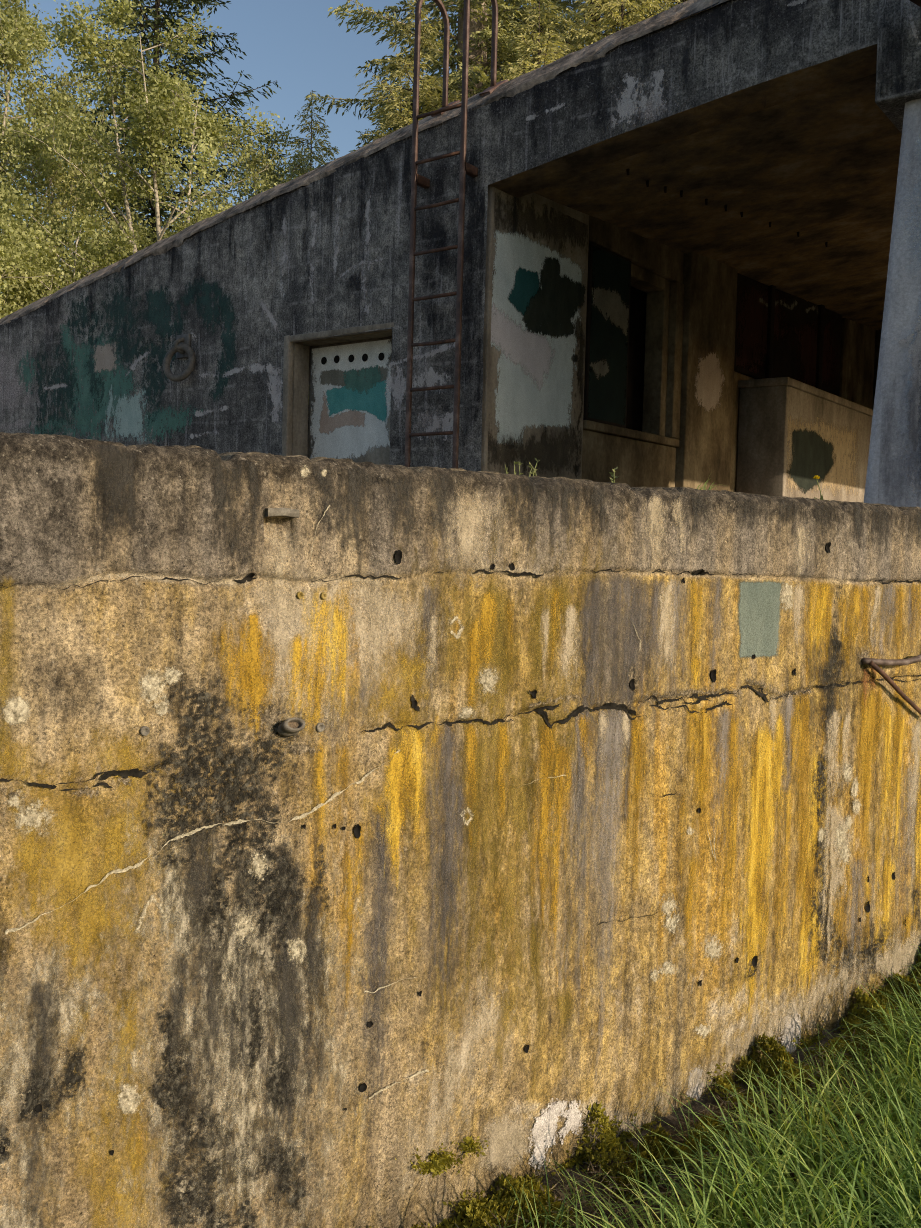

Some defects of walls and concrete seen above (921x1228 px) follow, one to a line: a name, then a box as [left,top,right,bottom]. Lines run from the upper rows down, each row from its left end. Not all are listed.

peeling [16,273,239,444]
damp [199,363,283,423]
damp [264,144,588,410]
damp [487,318,606,550]
peeling [491,231,609,444]
damp [0,579,167,980]
damp [64,459,686,1228]
crack [0,614,921,934]
damp [27,984,60,1227]
crack [364,977,417,993]
crack [369,1069,429,1099]
spalling [527,1098,588,1170]